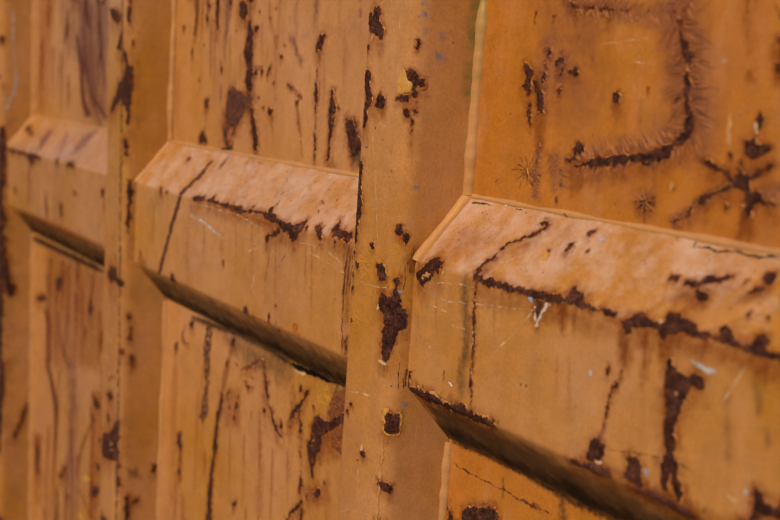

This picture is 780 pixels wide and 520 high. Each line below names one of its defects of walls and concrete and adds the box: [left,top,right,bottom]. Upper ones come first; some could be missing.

rust [183,0,285,153]
rust [192,68,428,293]
rust [313,33,326,162]
rust [522,40,580,128]
rust [561,0,780,237]
rust [376,262,408,365]
rust [743,270,780,294]
rust [286,385,354,520]
rust [447,502,499,520]
rust [476,274,780,520]